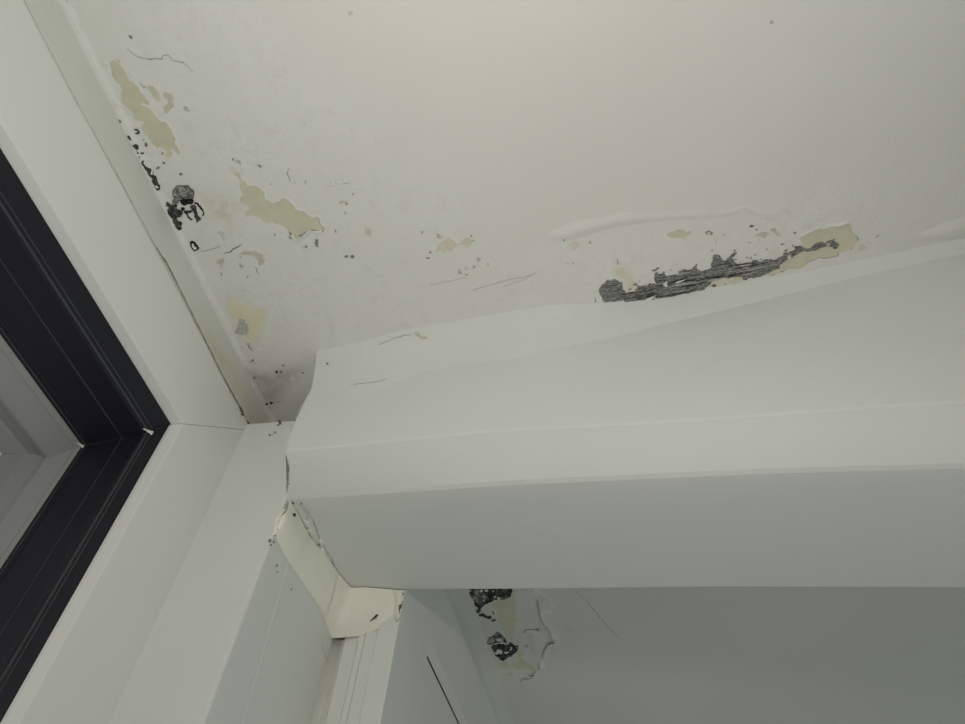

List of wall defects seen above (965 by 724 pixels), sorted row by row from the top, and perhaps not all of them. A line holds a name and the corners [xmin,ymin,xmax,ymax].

peeling [108,58,190,191]
spalling [166,173,204,231]
peeling [232,158,336,248]
spalling [595,219,879,302]
spalling [469,589,536,677]